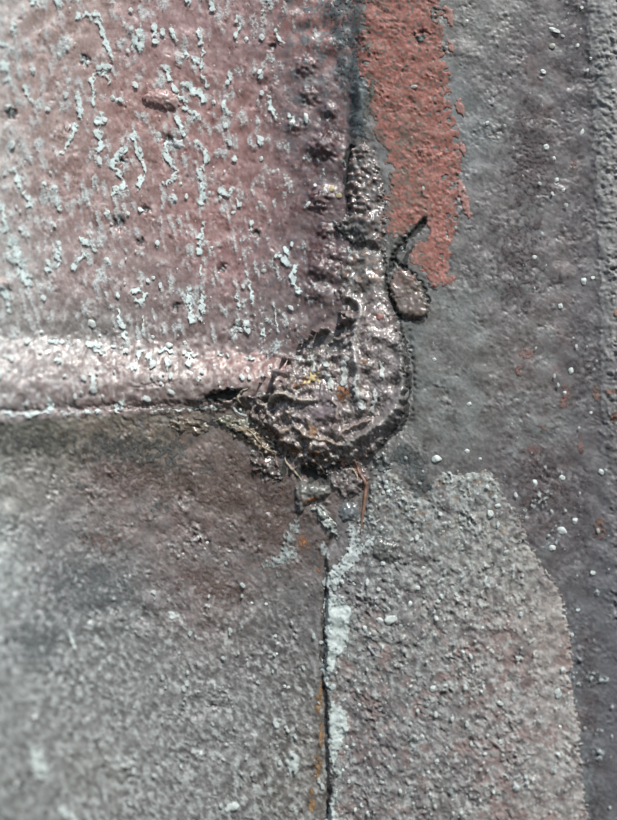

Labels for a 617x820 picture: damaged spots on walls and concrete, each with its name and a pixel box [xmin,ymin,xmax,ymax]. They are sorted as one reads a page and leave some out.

damp [129,23,159,51]
damp [59,10,114,154]
damp [160,28,210,136]
damp [109,130,147,196]
damp [162,141,179,186]
damp [194,139,210,205]
peeling [354,0,473,321]
damp [274,246,302,294]
damp [85,308,128,354]
damp [186,286,206,323]
crack [319,568,337,820]
damp [318,514,387,820]